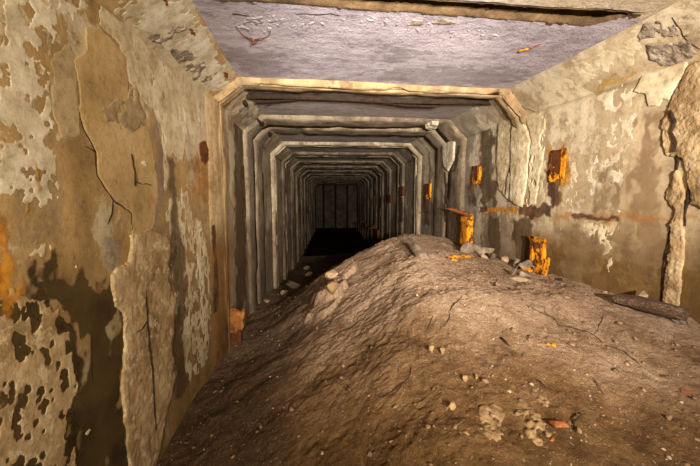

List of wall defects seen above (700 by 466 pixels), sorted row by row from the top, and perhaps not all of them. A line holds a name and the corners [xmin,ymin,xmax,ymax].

crack [79,112,133,230]
flaking render [0,0,232,466]
crack [131,154,152,186]
spalling [219,0,700,306]
corrosion [469,145,570,220]
damp [0,250,128,466]
crack [137,290,157,430]
corrosion [230,307,246,334]